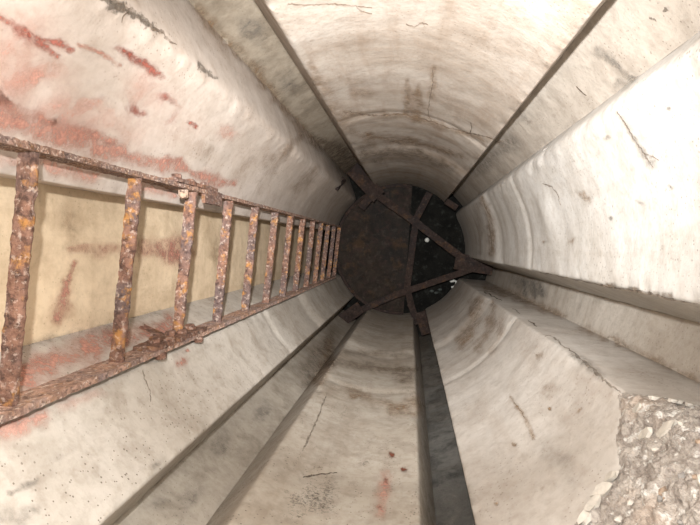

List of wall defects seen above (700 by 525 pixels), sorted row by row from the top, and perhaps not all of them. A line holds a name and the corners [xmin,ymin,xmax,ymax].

corrosion [0,16,110,59]
corrosion [119,48,161,76]
corrosion [0,104,235,186]
corrosion [54,261,76,321]
corrosion [19,332,113,388]
spalling [575,382,700,525]